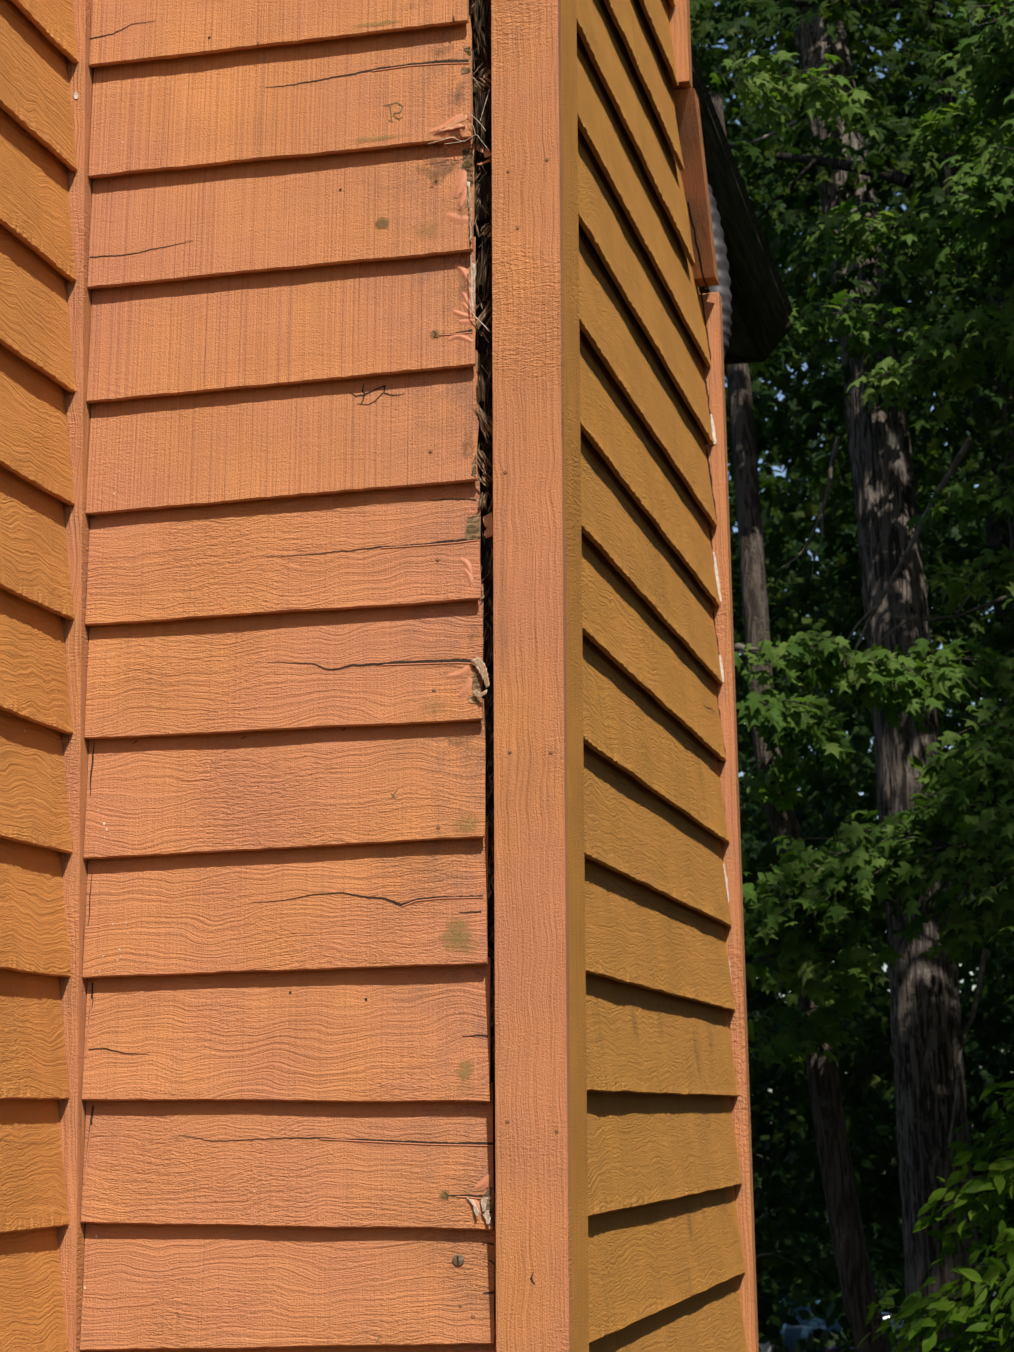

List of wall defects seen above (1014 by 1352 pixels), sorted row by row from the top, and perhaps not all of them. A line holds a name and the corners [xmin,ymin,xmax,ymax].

crack [274,59,469,87]
crack [432,495,476,503]
crack [265,538,480,557]
crack [267,658,472,670]
crack [251,892,483,913]
crack [180,1135,493,1147]